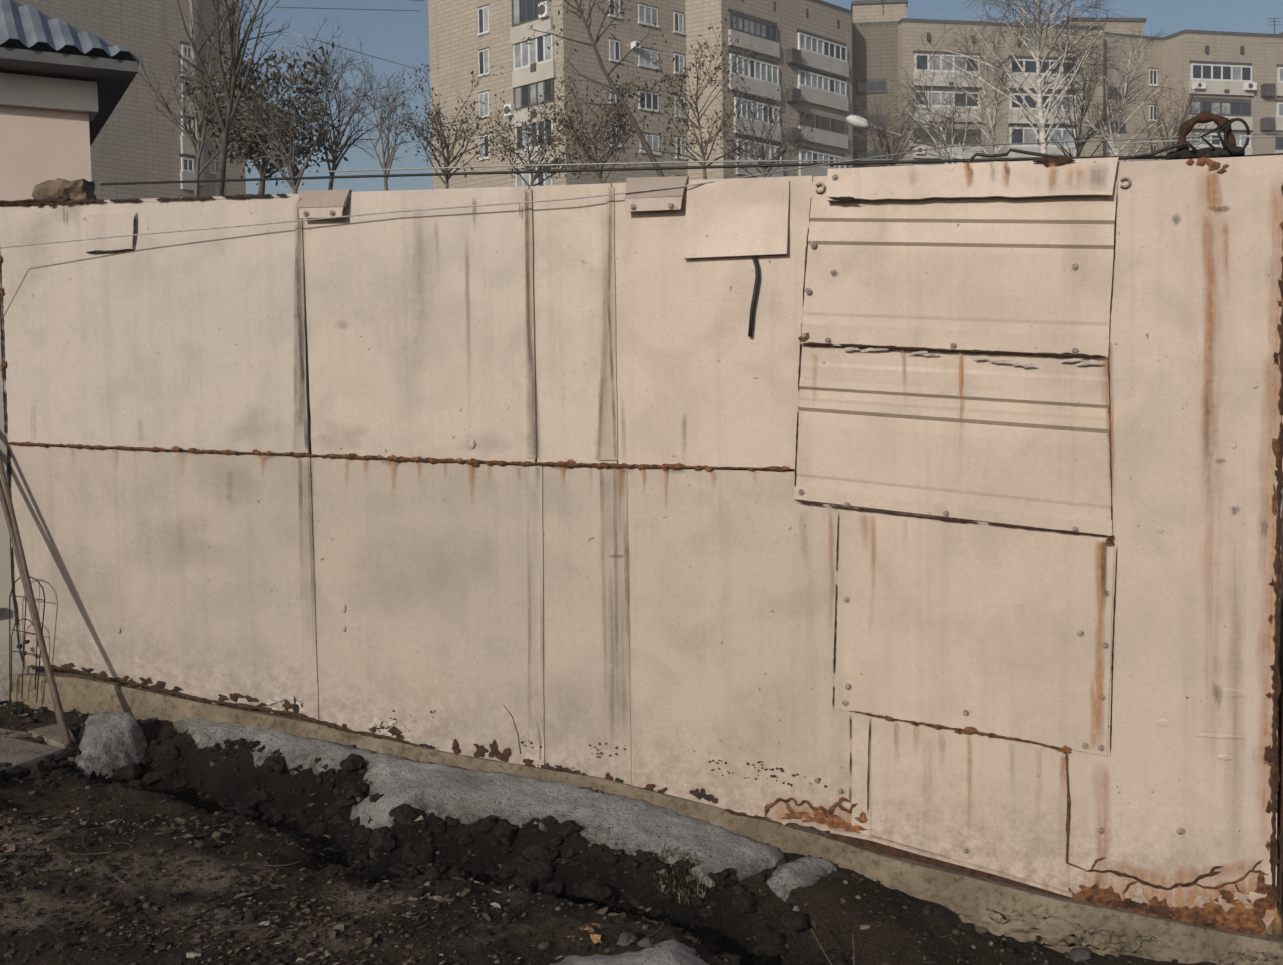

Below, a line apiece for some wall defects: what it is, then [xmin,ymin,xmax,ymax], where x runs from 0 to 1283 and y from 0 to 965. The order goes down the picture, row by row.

rust [0,193,287,207]
rust [1032,157,1075,181]
rust [1186,157,1229,210]
rust [0,287,790,493]
rust [851,221,1283,936]
rust [797,501,1114,729]
rust [10,539,435,749]
rust [452,739,587,776]
rust [589,742,626,783]
rust [709,760,827,788]
rust [689,788,763,820]